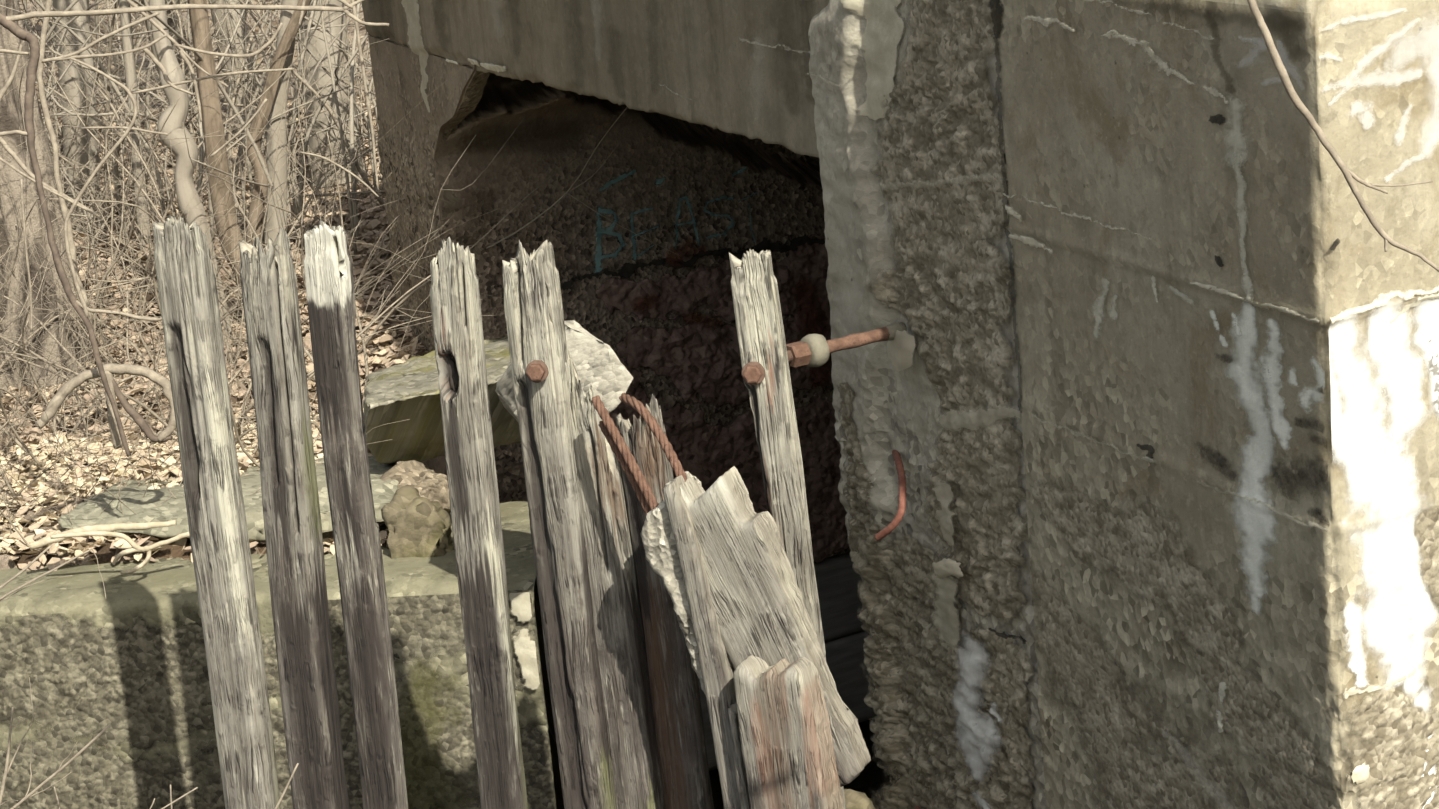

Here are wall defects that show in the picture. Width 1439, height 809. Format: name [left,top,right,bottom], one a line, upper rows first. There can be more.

corrosion [794,278,825,336]
leakage [1093,279,1118,337]
leakage [1151,275,1193,304]
spalling [595,259,767,514]
corrosion [811,357,831,387]
spalling [771,0,1439,809]
leakage [1210,99,1439,712]
leakage [932,481,955,546]
leakage [929,576,1002,809]
leakage [1421,734,1435,809]